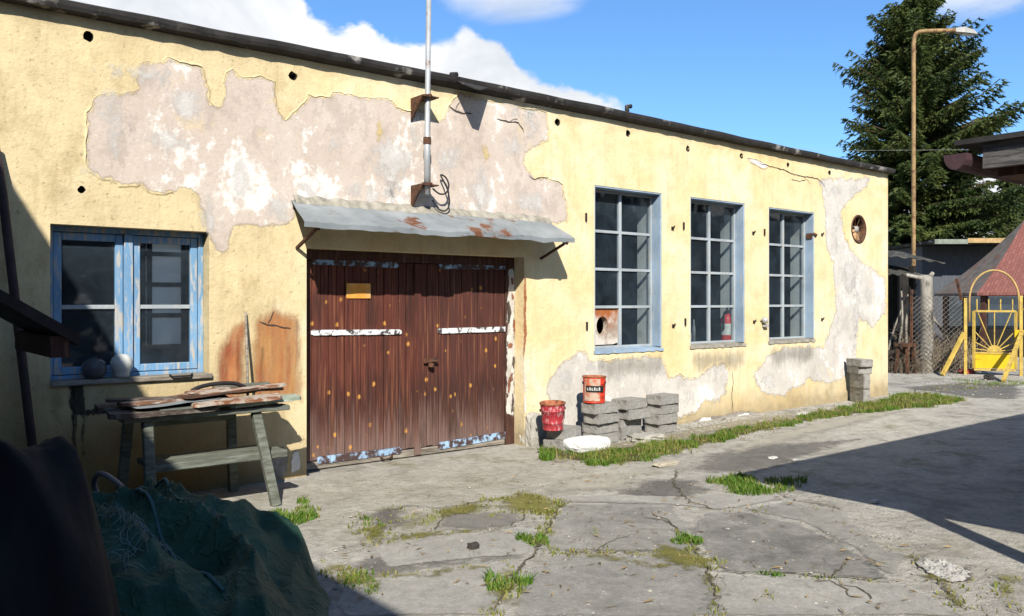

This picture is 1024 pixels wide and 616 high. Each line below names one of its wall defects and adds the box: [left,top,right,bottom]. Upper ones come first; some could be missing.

flaking render [83,55,568,252]
crack [760,163,827,192]
flaking render [752,174,887,399]
rust [220,313,297,397]
flaking render [545,349,760,436]
crack [671,470,716,510]
crack [380,495,889,610]